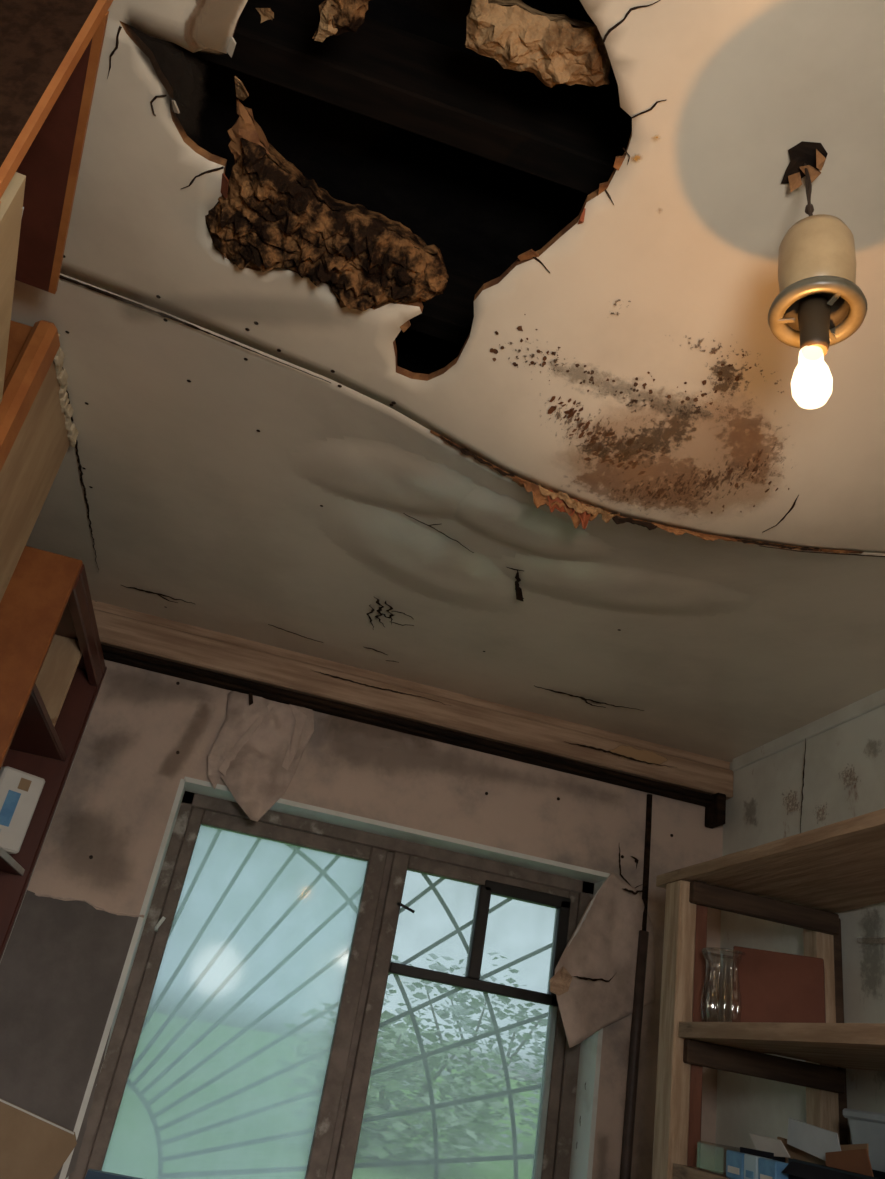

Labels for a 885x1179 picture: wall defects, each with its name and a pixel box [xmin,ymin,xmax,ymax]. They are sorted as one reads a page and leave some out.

crack [602,0,660,43]
crack [107,26,122,79]
peeling [227,36,236,58]
peeling [234,76,249,101]
crack [150,95,166,116]
crack [631,100,666,118]
peeling [614,156,625,171]
crack [181,166,224,189]
peeling [221,173,229,199]
peeling [518,249,539,261]
flaking render [0,890,144,1179]